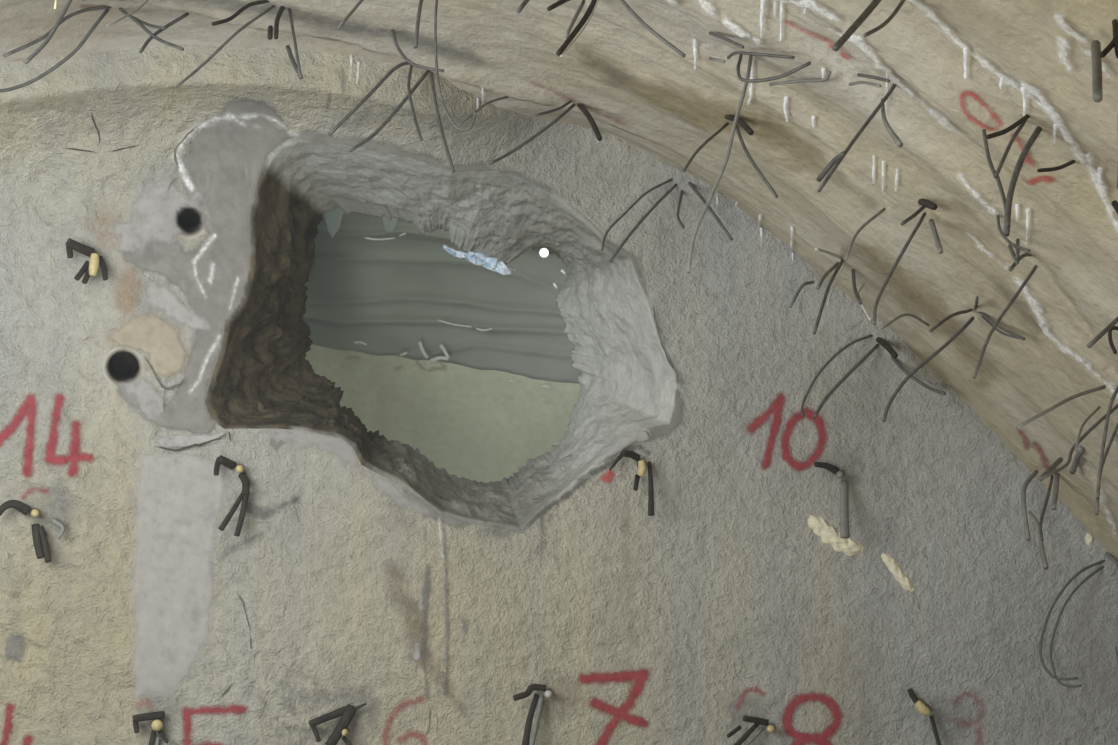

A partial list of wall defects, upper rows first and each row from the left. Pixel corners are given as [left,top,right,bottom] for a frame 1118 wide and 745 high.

spalling [270,428,464,527]
spalling [527,390,684,525]